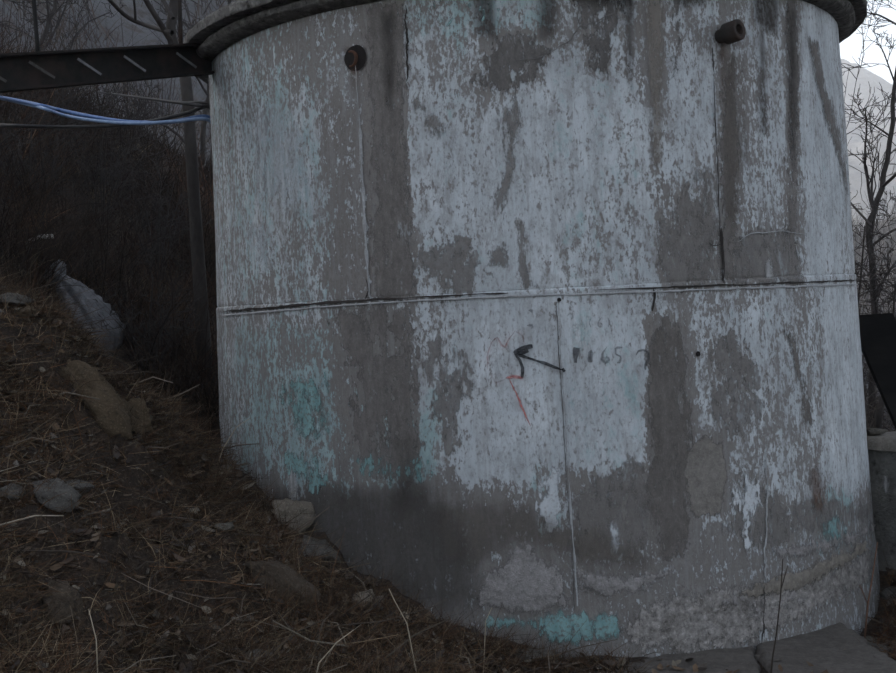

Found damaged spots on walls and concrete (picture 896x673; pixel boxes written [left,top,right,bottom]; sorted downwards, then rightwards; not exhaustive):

leakage [477,0,493,34]
peeling [573,0,626,74]
peeling [469,31,553,217]
crack [599,48,854,311]
peeling [718,0,849,289]
peeling [417,220,537,304]
peeling [327,304,475,495]
peeling [575,316,693,562]
peeling [706,329,769,442]
peeling [784,330,812,426]
peeling [722,471,874,551]
spalling [619,540,875,654]